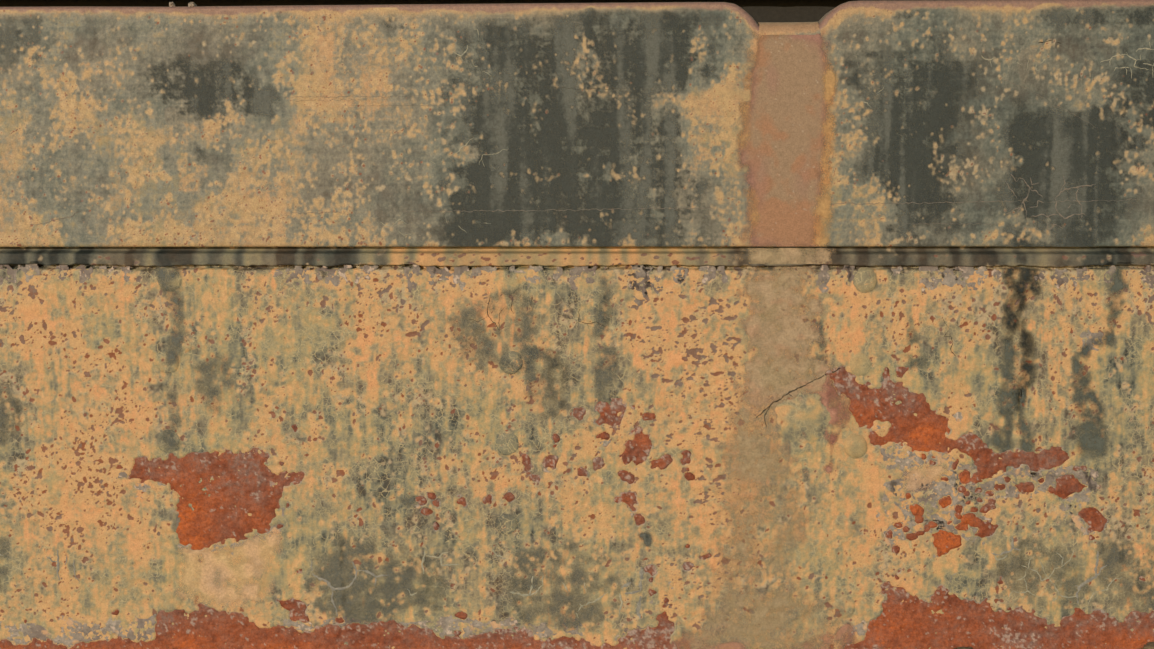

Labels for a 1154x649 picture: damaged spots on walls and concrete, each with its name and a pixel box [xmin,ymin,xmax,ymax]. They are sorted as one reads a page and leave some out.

rust [521,434,560,483]
rust [573,398,695,526]
crack [756,367,845,427]
rust [812,366,1107,558]
damp [993,267,1040,452]
rust [0,448,746,649]
rust [795,569,1154,649]